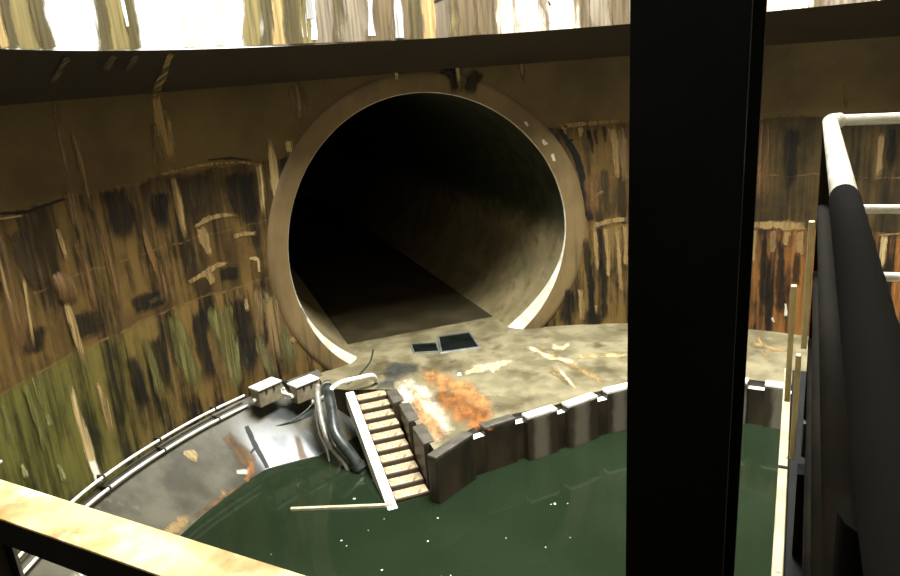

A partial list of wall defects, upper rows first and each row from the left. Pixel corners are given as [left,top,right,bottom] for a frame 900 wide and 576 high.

leakage [152,54,174,167]
leakage [151,174,211,231]
leakage [227,143,279,215]
leakage [23,326,43,352]
leakage [67,311,100,344]
leakage [127,289,297,403]
leakage [23,377,51,448]
leakage [96,384,113,430]
rust [398,372,489,438]